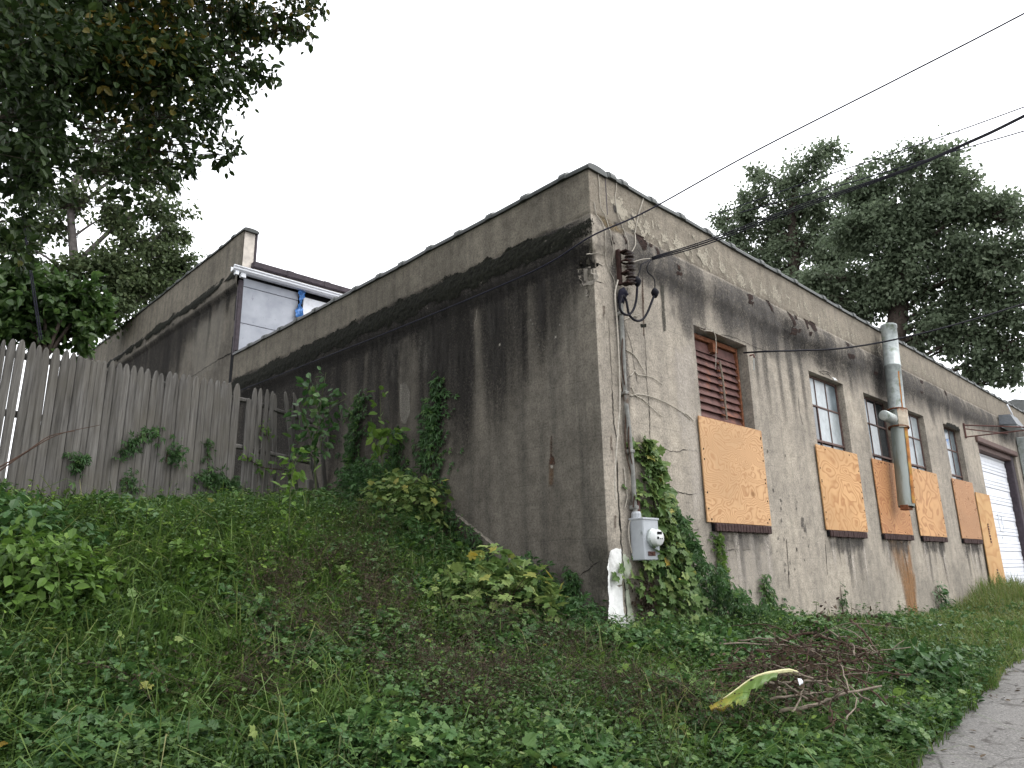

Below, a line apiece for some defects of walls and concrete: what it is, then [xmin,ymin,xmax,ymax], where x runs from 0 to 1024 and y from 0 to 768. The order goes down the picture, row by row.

damp [229,222,595,489]
peeling [607,190,881,359]
damp [628,236,886,392]
damp [901,369,1024,441]
rust [890,542,918,613]